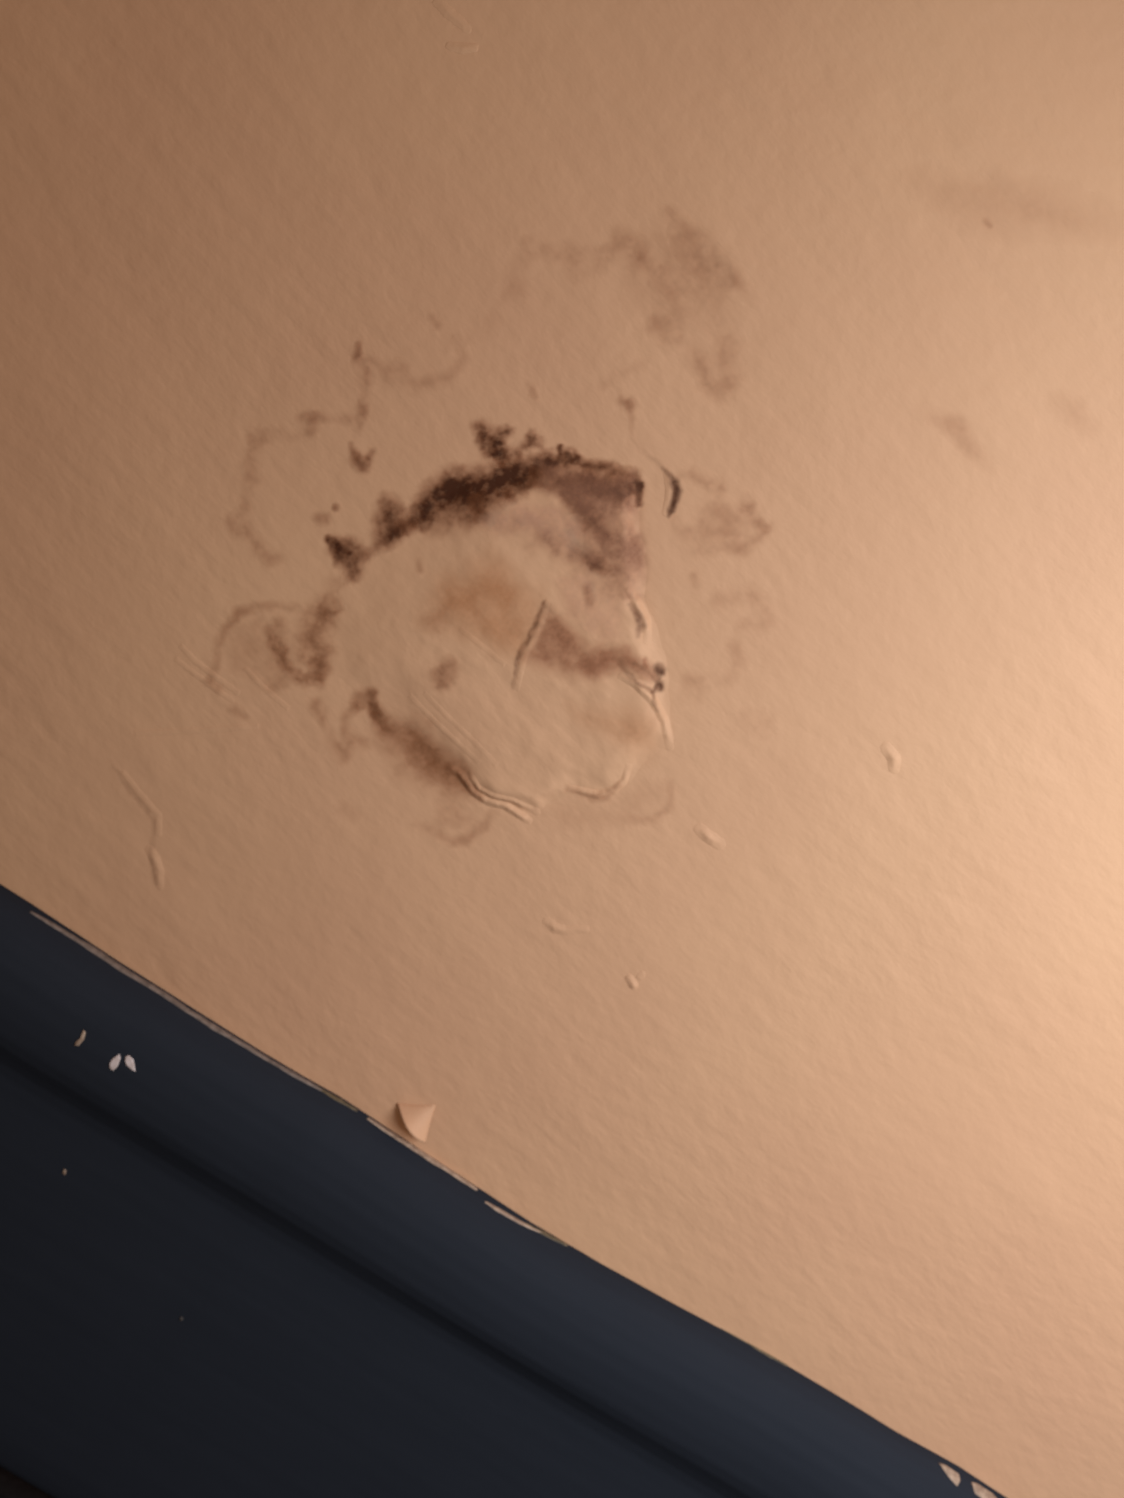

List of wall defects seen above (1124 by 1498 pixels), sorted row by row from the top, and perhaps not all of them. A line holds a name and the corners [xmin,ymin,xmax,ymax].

leakage [378,425,644,571]
mould [326,536,359,578]
leakage [368,691,392,732]
peeling [30,911,568,1246]
peeling [938,1462,996,1498]